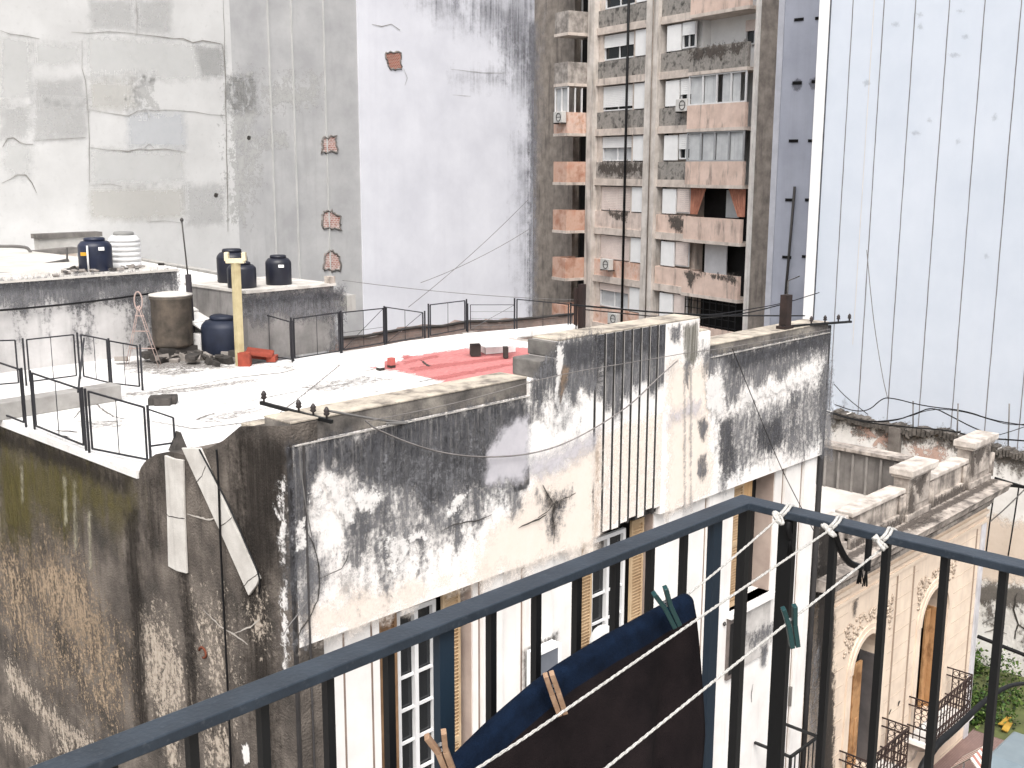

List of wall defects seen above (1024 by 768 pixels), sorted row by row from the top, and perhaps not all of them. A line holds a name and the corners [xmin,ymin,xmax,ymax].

spalling [385,51,403,71]
crack [3,3,228,208]
spalling [321,135,339,154]
spalling [321,209,342,231]
spalling [323,249,342,273]
water stain [0,268,180,354]
crack [519,486,575,541]
water stain [228,323,888,682]
peeling [905,442,949,462]
water stain [881,440,1024,531]
water stain [0,431,162,724]
water stain [804,592,837,768]